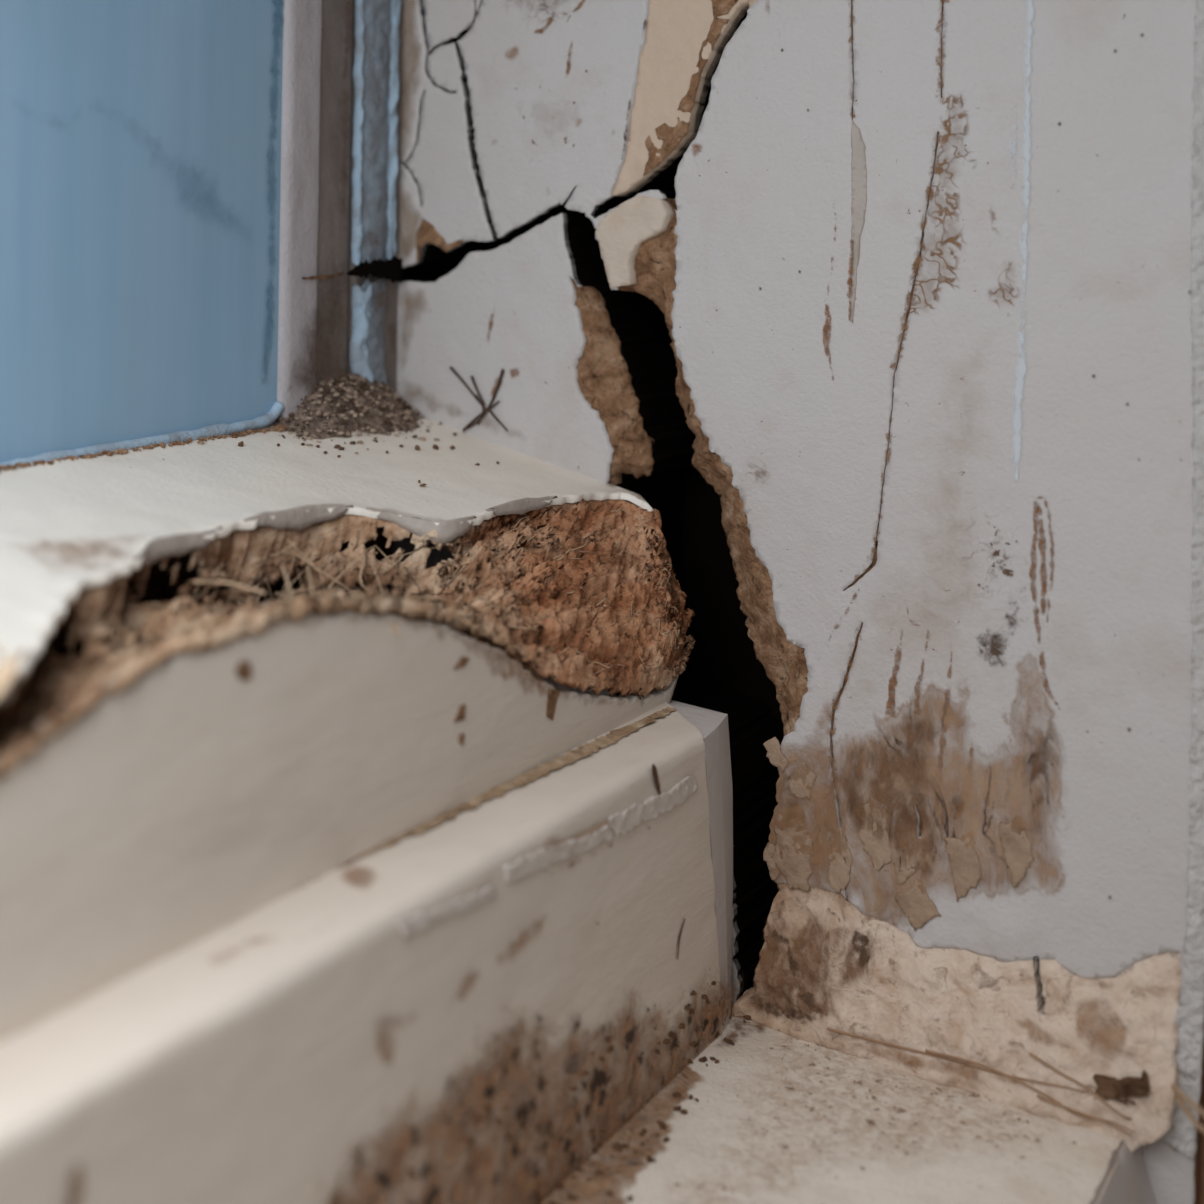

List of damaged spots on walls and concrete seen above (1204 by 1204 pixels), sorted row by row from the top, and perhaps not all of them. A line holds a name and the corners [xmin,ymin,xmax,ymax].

crack [848,0,856,120]
rust [890,0,967,368]
crack [844,131,939,591]
peeling [0,646,27,706]
peeling [133,526,223,566]
peeling [243,496,558,543]
crack [302,0,784,1001]
crack [830,622,863,822]
spalling [571,0,1181,1153]
rust [1029,497,1058,705]
leakage [330,969,739,1204]
leakage [703,1038,1043,1186]